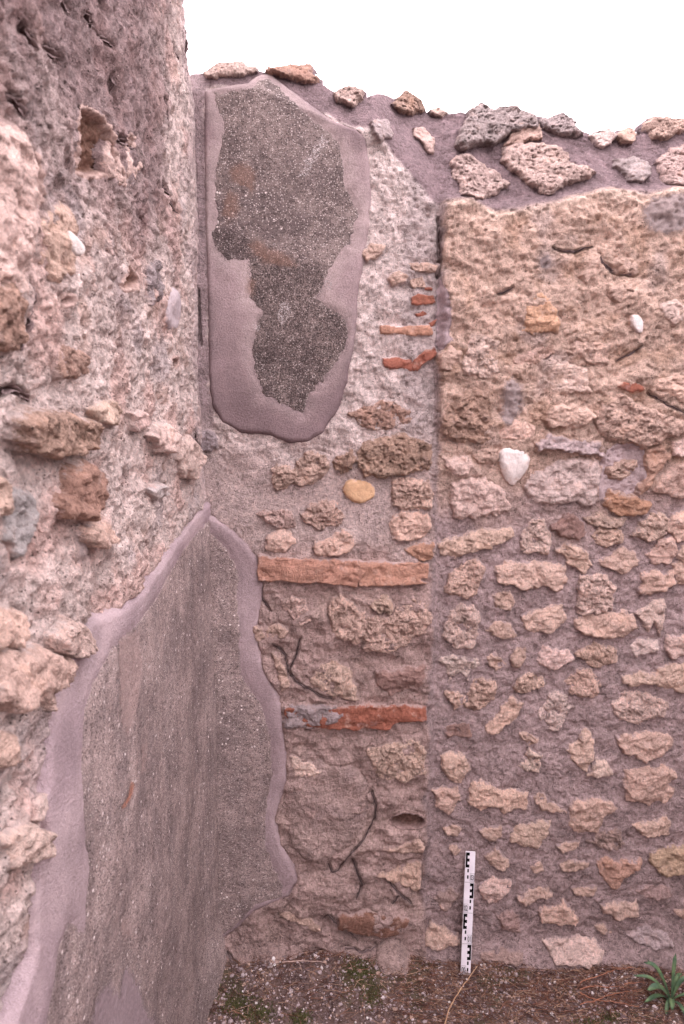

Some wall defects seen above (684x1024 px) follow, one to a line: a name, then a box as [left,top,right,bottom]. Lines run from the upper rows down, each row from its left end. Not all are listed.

crack [274,640,332,699]
crack [328,792,377,900]
crack [390,882,411,904]